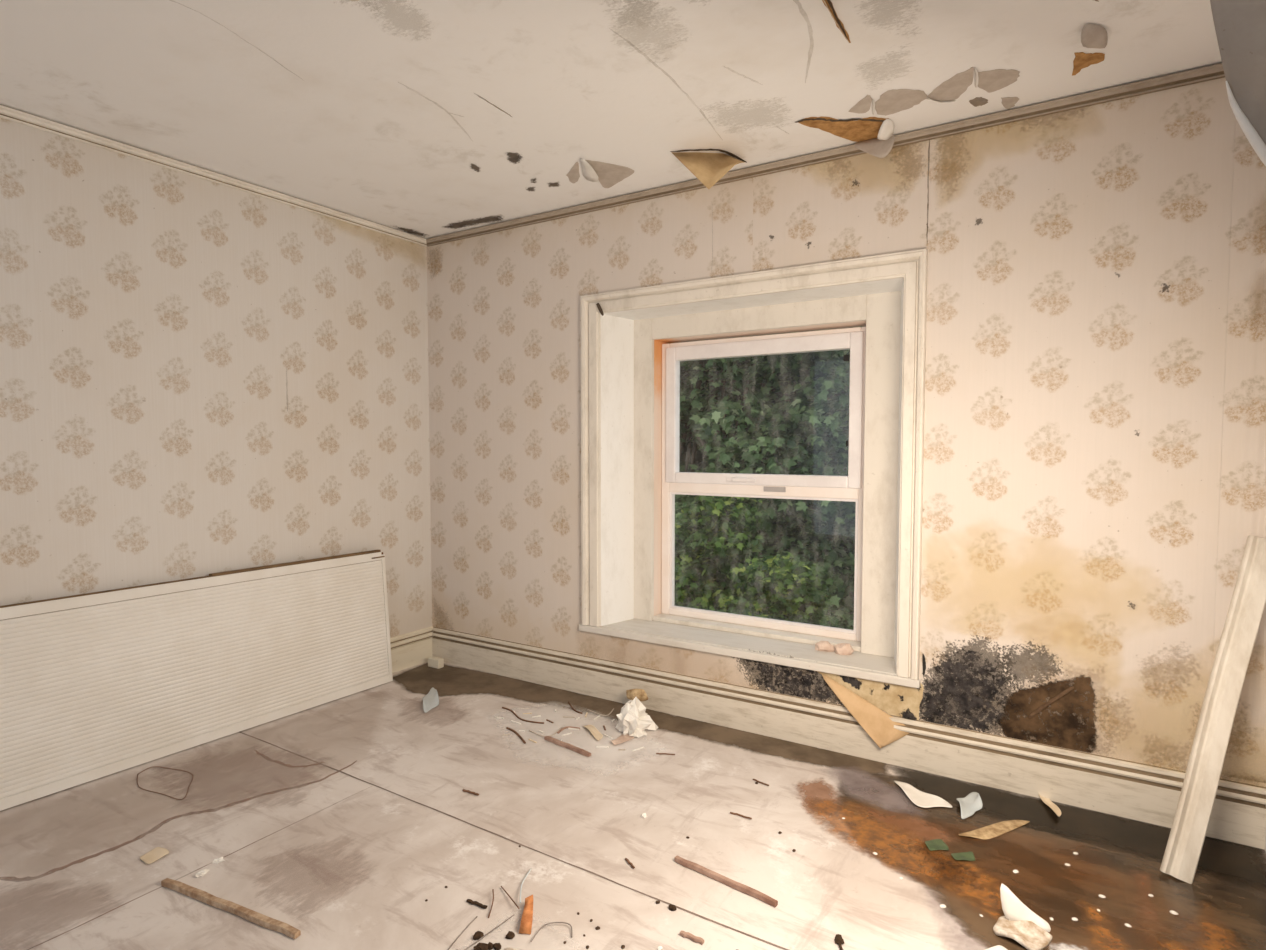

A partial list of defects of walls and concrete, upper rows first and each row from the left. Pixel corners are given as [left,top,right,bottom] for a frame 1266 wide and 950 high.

peeling [795,67,1020,158]
water stain [393,663,625,720]
water stain [731,634,1097,753]
water stain [645,709,1266,950]